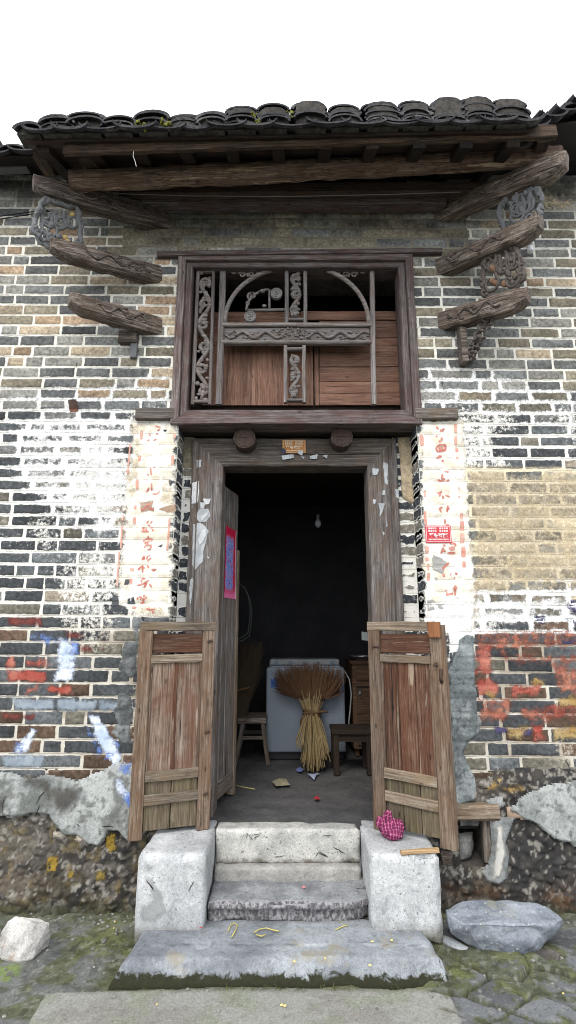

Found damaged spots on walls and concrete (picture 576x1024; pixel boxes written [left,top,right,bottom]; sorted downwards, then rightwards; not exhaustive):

peeling [0,374,177,618]
peeling [419,365,576,663]
flaking render [0,762,132,846]